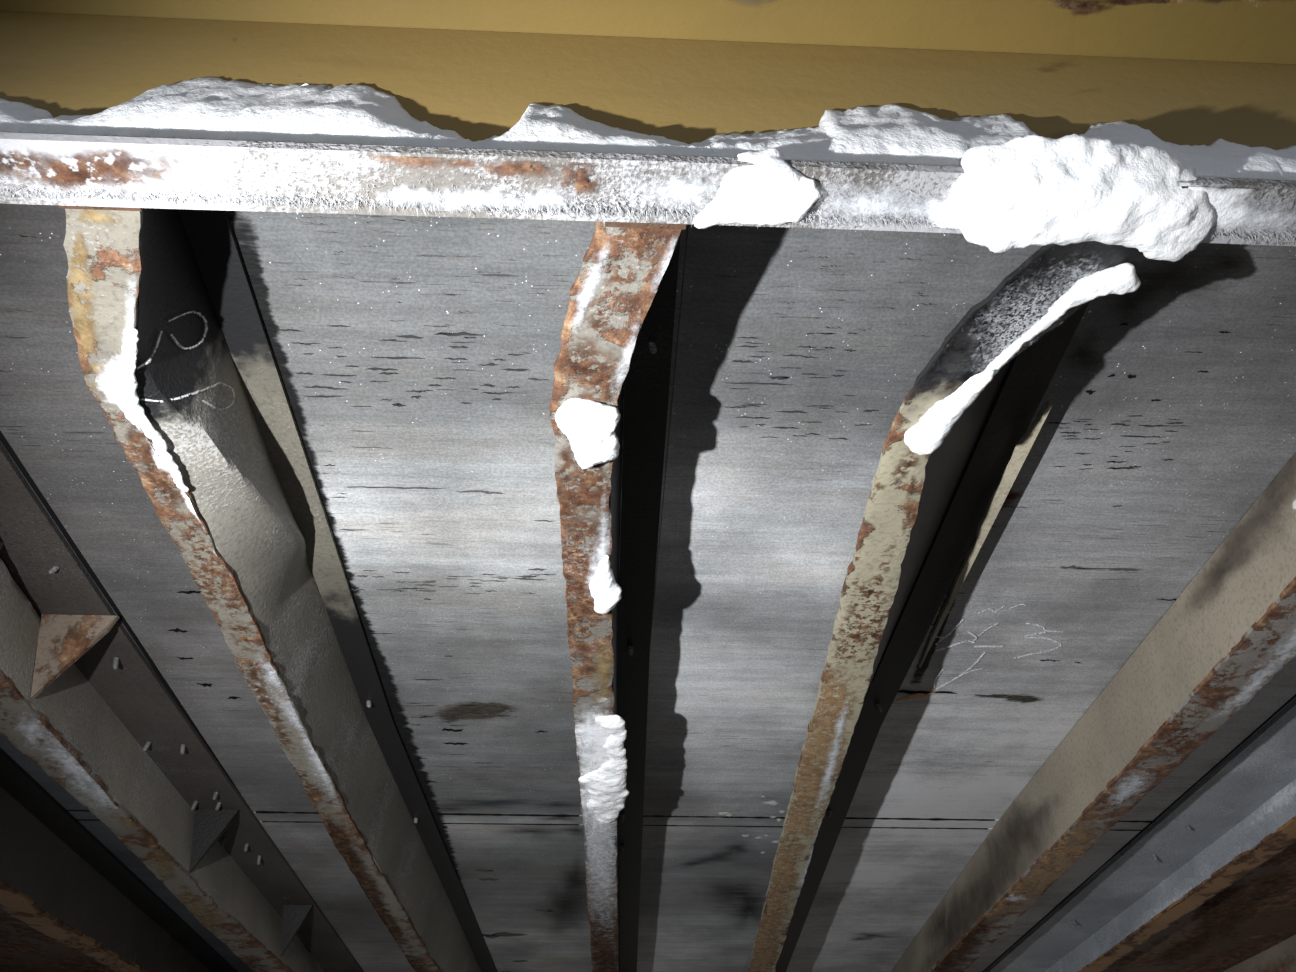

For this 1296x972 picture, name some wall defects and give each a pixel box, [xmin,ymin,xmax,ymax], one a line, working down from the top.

rust [0,155,132,186]
rust [566,303,618,402]
rust [609,228,660,293]
water stain [929,255,1047,381]
rust [129,431,178,509]
rust [183,526,290,745]
water stain [227,211,461,880]
rust [557,451,612,703]
rust [783,547,894,840]
rust [876,453,917,527]
water stain [911,534,982,683]
rust [329,823,426,972]